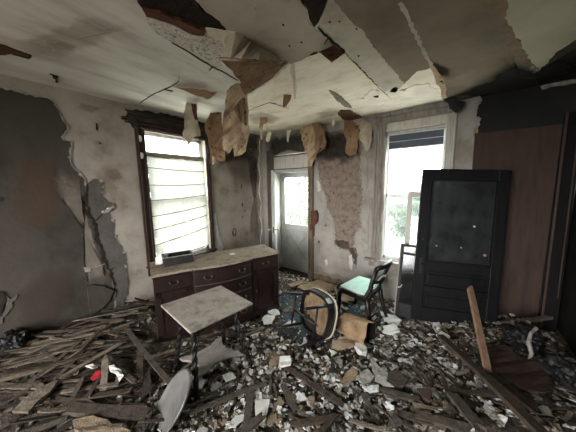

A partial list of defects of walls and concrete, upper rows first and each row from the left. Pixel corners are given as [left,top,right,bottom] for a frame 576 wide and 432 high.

crack [140,76,180,103]
peeling [146,17,225,66]
peeling [173,86,217,99]
crack [172,42,238,81]
peeling [247,0,483,169]
spalling [541,40,576,69]
spalling [0,86,129,338]
spalling [316,129,369,271]
crack [83,184,117,298]